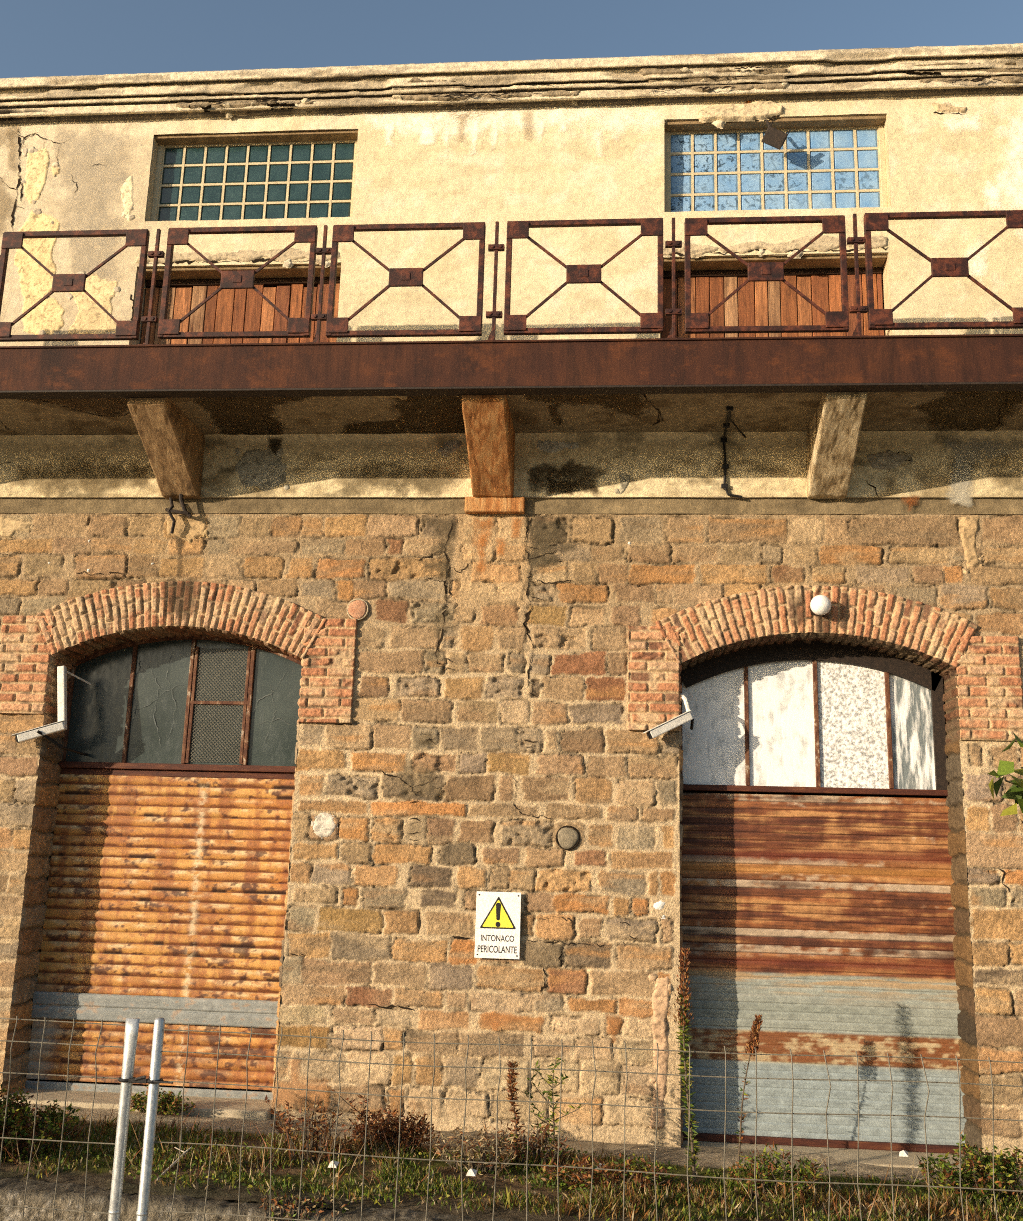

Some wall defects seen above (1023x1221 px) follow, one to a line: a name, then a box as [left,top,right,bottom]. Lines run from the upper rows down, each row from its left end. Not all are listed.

spalling [176,94,315,118]
spalling [391,78,580,106]
spalling [638,65,789,129]
spalling [904,62,1023,113]
crack [0,132,103,230]
flaking render [14,146,121,335]
damp [19,462,144,490]
damp [350,466,453,495]
damp [530,460,602,494]
damp [918,391,1023,506]
crack [416,518,468,667]
crack [523,518,572,697]